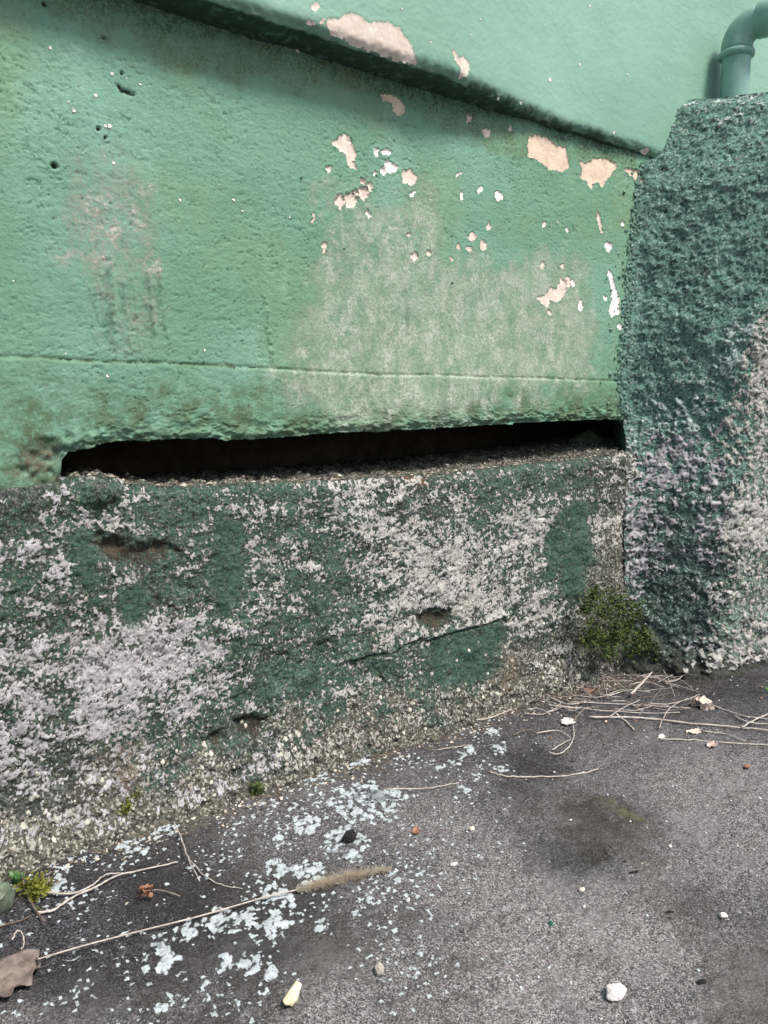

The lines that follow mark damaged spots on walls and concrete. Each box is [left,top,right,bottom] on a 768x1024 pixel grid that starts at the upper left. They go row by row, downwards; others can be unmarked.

peeling [306,2,417,66]
peeling [380,94,405,116]
peeling [670,92,768,149]
peeling [331,134,417,219]
peeling [527,135,643,189]
peeling [596,210,613,252]
peeling [536,264,575,315]
peeling [603,269,632,330]
crack [350,618,505,675]
leakage [249,641,633,783]
leakage [0,743,238,864]